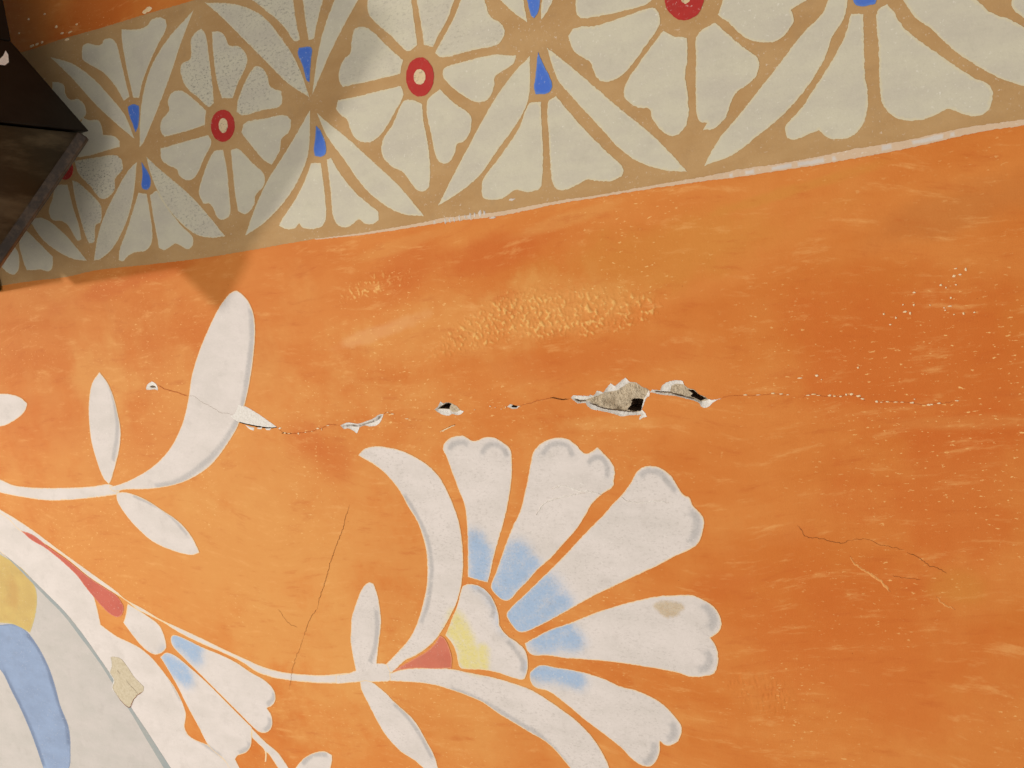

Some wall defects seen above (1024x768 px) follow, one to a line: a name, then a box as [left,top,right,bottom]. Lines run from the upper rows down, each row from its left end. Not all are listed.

peeling [231,405,280,431]
crack [280,424,334,434]
flaking render [340,414,383,433]
flaking render [435,402,464,416]
flaking render [571,378,718,420]
crack [726,367,959,406]
crack [799,527,955,610]